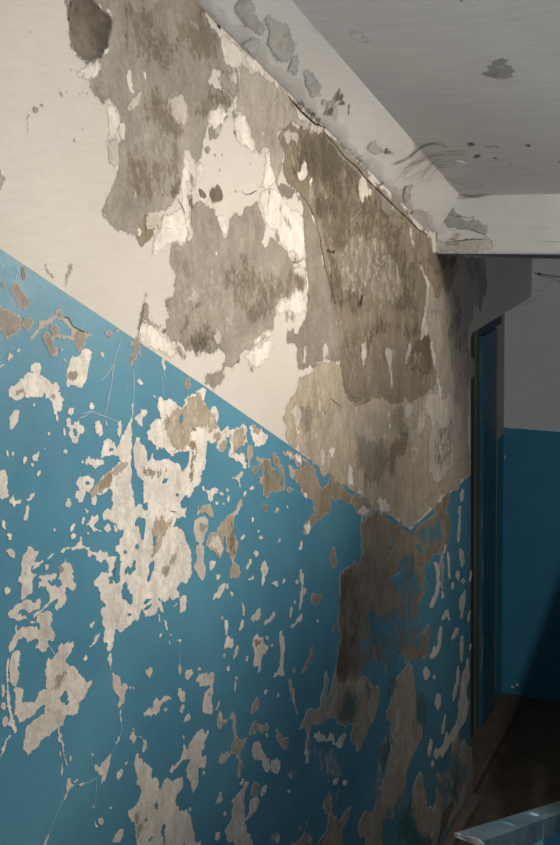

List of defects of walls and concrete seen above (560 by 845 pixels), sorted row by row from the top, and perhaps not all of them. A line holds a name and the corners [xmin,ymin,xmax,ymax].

peeling [483,58,514,80]
crack [289,97,429,236]
peeling [367,141,393,155]
spalling [436,208,492,255]
flaking render [0,0,373,845]
water stain [278,123,487,690]
flaking render [221,489,473,845]